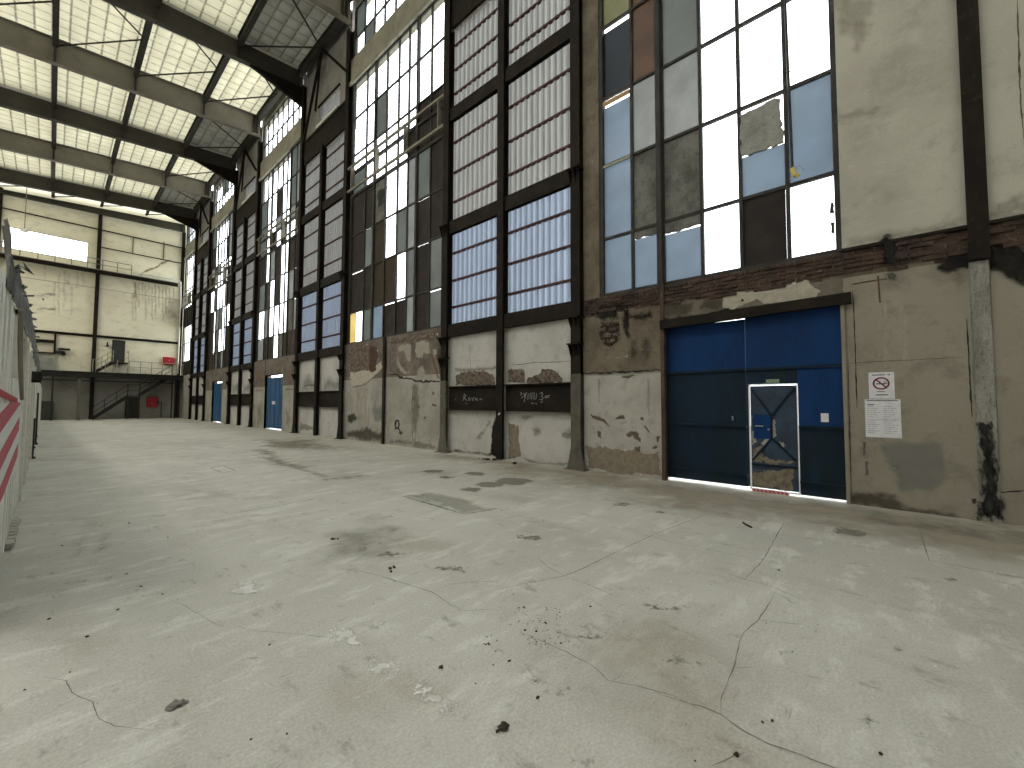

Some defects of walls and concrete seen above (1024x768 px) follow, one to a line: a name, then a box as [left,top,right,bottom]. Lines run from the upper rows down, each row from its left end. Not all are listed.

peeling [722,280,820,310]
spalling [349,344,382,386]
peeling [397,341,437,378]
spalling [455,370,495,386]
spalling [508,369,562,384]
peeling [586,414,662,476]
crack [361,509,835,768]
crack [44,677,146,730]